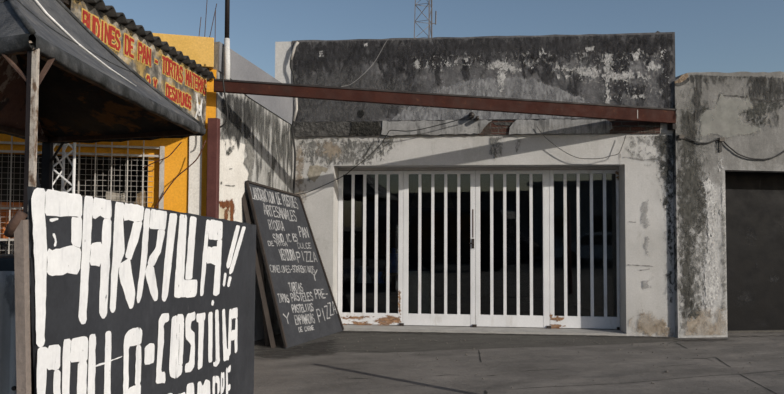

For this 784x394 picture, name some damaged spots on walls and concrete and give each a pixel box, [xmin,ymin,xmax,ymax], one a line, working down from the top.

spalling [478,120,516,135]
spalling [605,119,660,134]
damp [221,93,399,202]
damp [293,34,784,332]
rust [341,290,401,326]